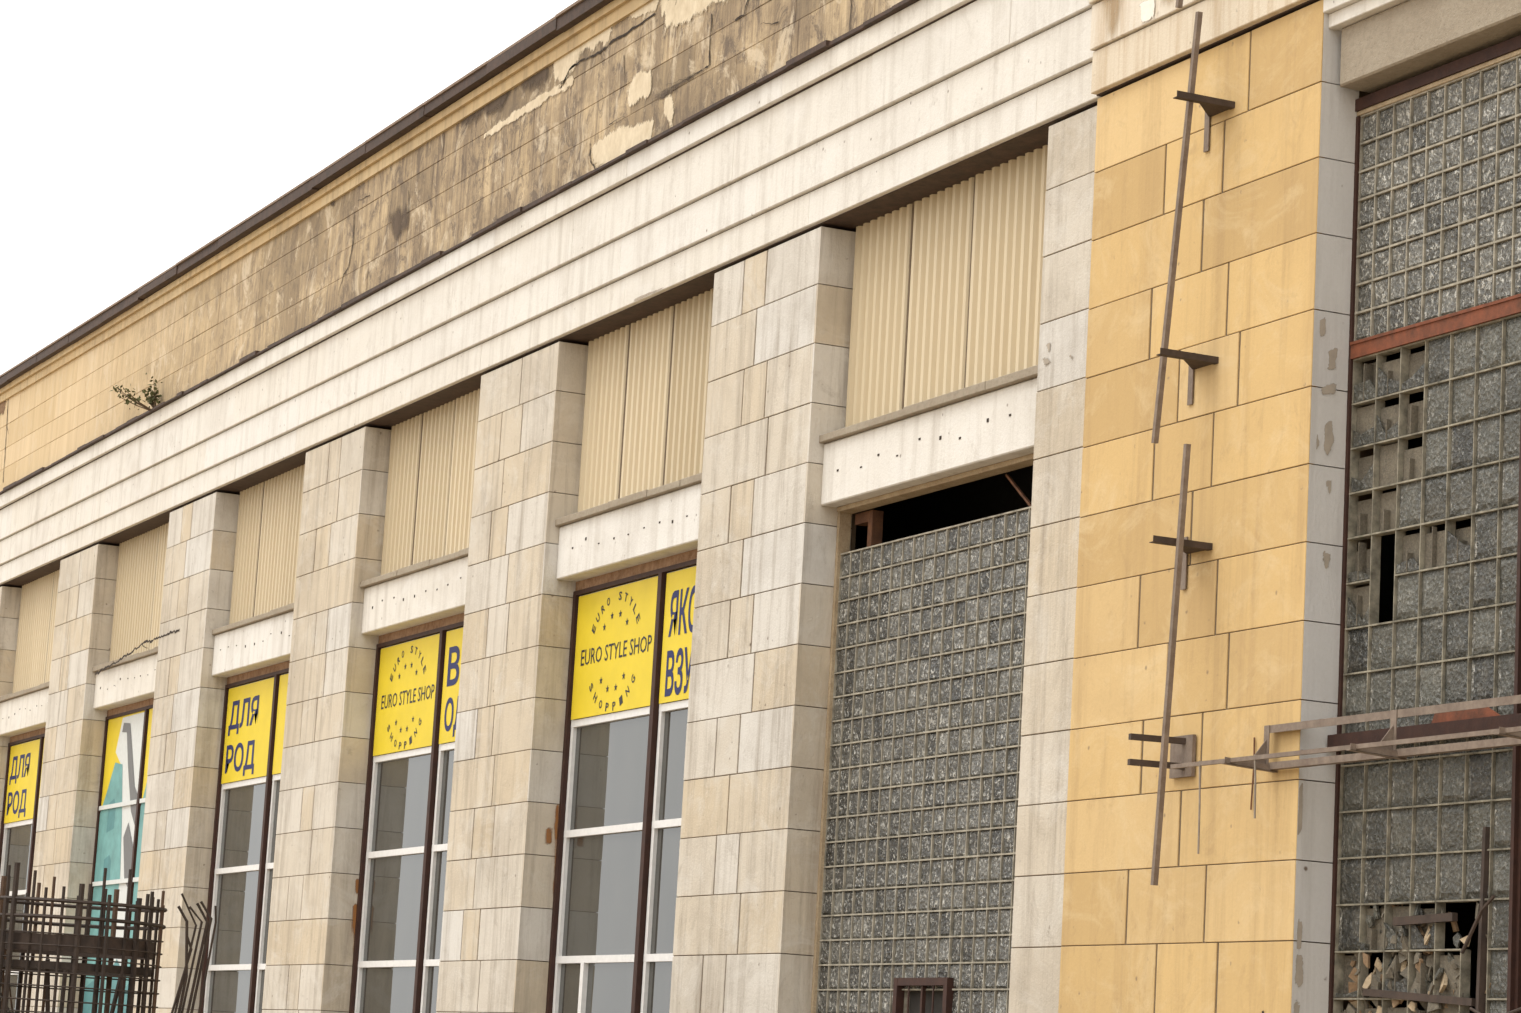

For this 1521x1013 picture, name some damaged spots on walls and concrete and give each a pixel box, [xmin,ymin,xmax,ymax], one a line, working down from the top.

peeling [629,0,725,31]
peeling [1139,0,1155,22]
damp [462,67,548,125]
peeling [484,26,613,138]
peeling [591,66,674,168]
damp [391,207,408,240]